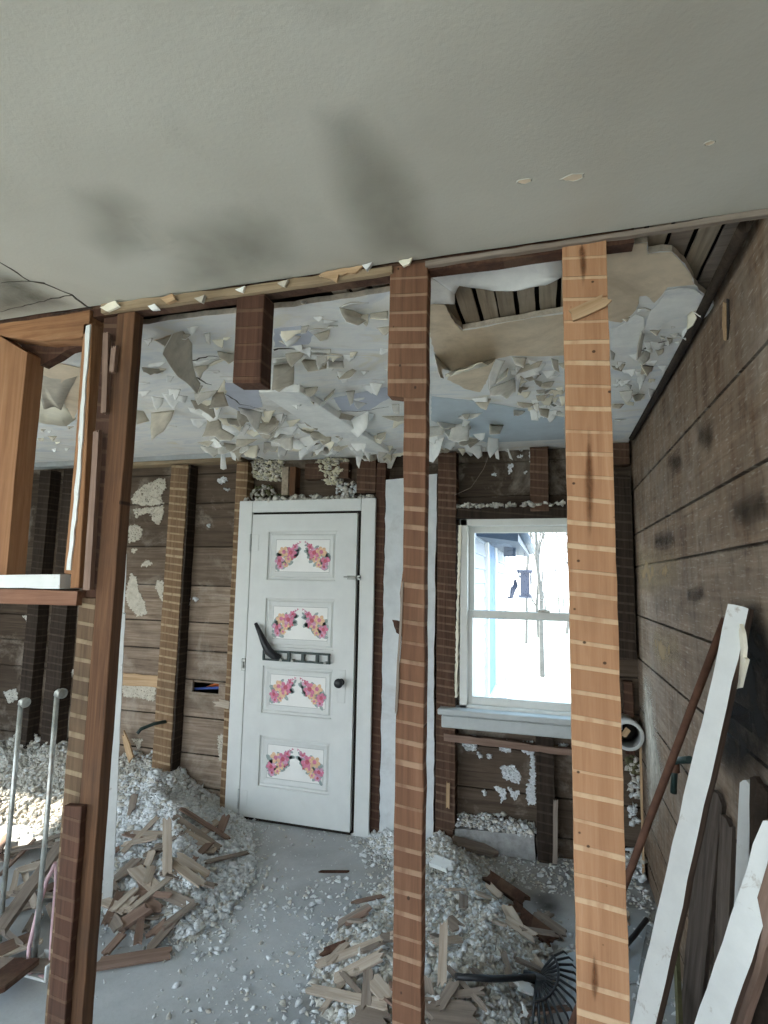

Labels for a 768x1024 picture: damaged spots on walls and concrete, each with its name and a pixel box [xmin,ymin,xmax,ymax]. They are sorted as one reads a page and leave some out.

crack [0,262,93,315]
peeling [38,363,80,452]
peeling [100,301,121,312]
peeling [136,262,404,491]
peeling [429,260,565,476]
peeling [607,219,740,422]
peeling [125,478,167,617]